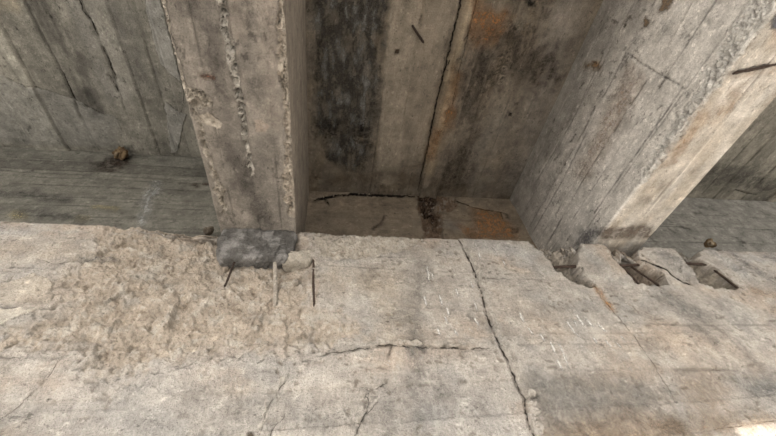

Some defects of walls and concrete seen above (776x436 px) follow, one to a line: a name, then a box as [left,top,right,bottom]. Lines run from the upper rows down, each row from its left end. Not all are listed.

spalling [274,0,296,218]
water stain [312,0,387,171]
crack [314,0,477,205]
spalling [0,195,460,388]
crack [328,240,545,436]
spalling [533,244,597,288]
spalling [604,244,669,287]
spalling [674,248,744,290]